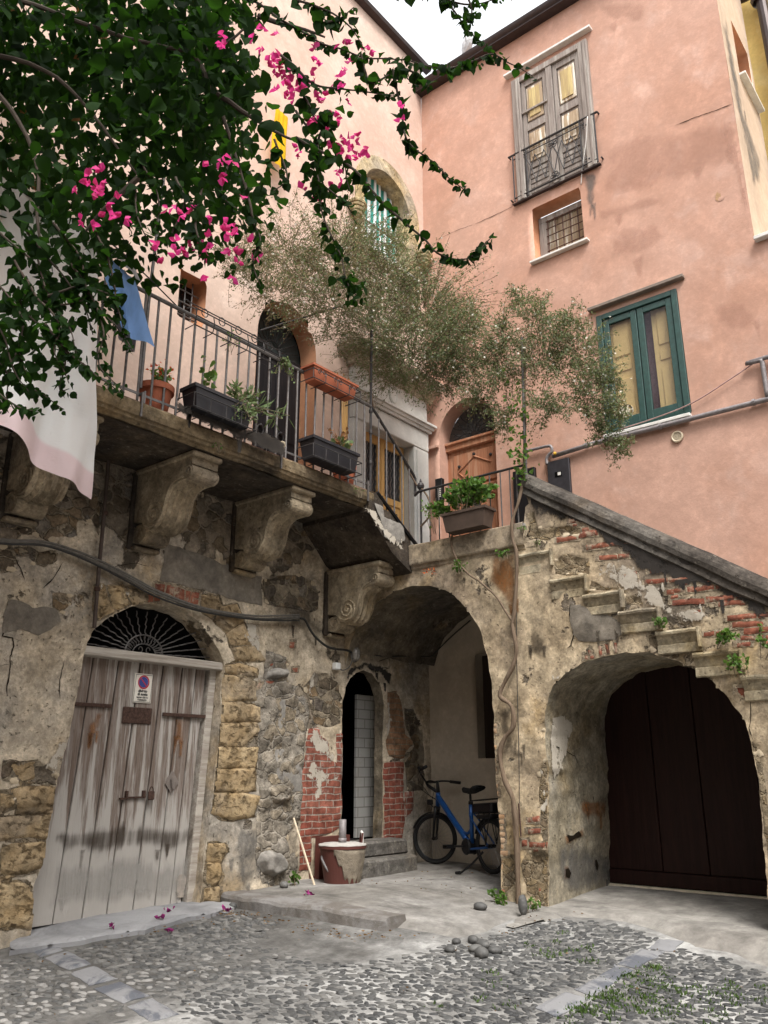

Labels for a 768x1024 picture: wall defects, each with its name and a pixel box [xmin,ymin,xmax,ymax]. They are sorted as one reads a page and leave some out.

water stain [727,39,759,178]
water stain [586,175,595,218]
peeling [365,508,403,549]
flaking render [526,512,768,647]
crack [1,633,21,696]
flaking render [581,638,619,662]
flaking render [648,634,696,668]
flaking render [0,742,67,931]
flaking render [200,841,230,903]
flaking render [92,581,343,886]
flaking render [382,691,425,838]
flaking render [499,715,573,907]